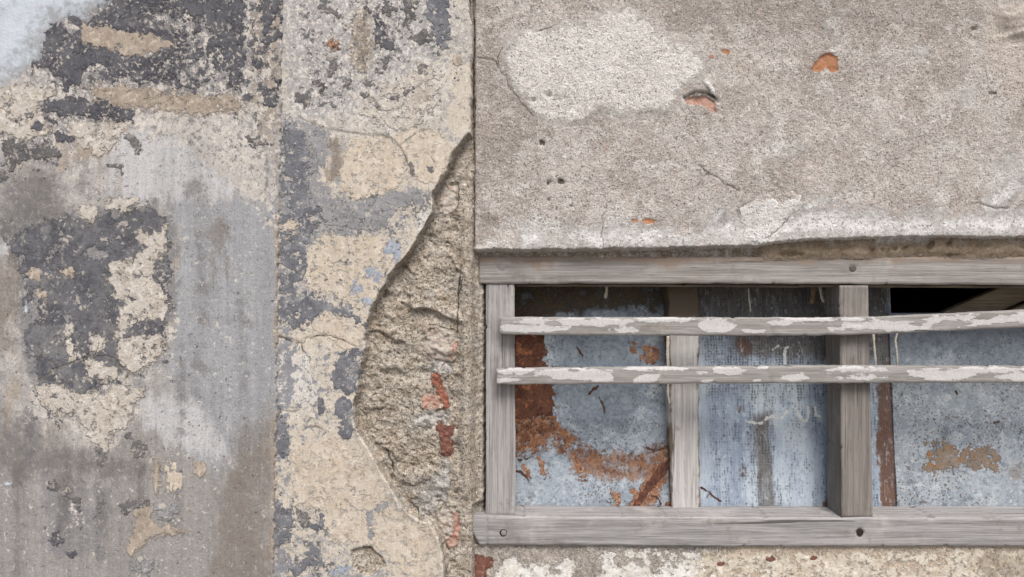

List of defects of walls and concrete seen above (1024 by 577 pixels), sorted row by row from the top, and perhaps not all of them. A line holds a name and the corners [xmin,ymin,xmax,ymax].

spalling [811,52,839,73]
spalling [684,82,718,113]
spalling [0,0,580,577]
corrosion [514,335,548,367]
corrosion [628,341,663,365]
corrosion [515,384,670,506]
corrosion [921,438,1004,476]